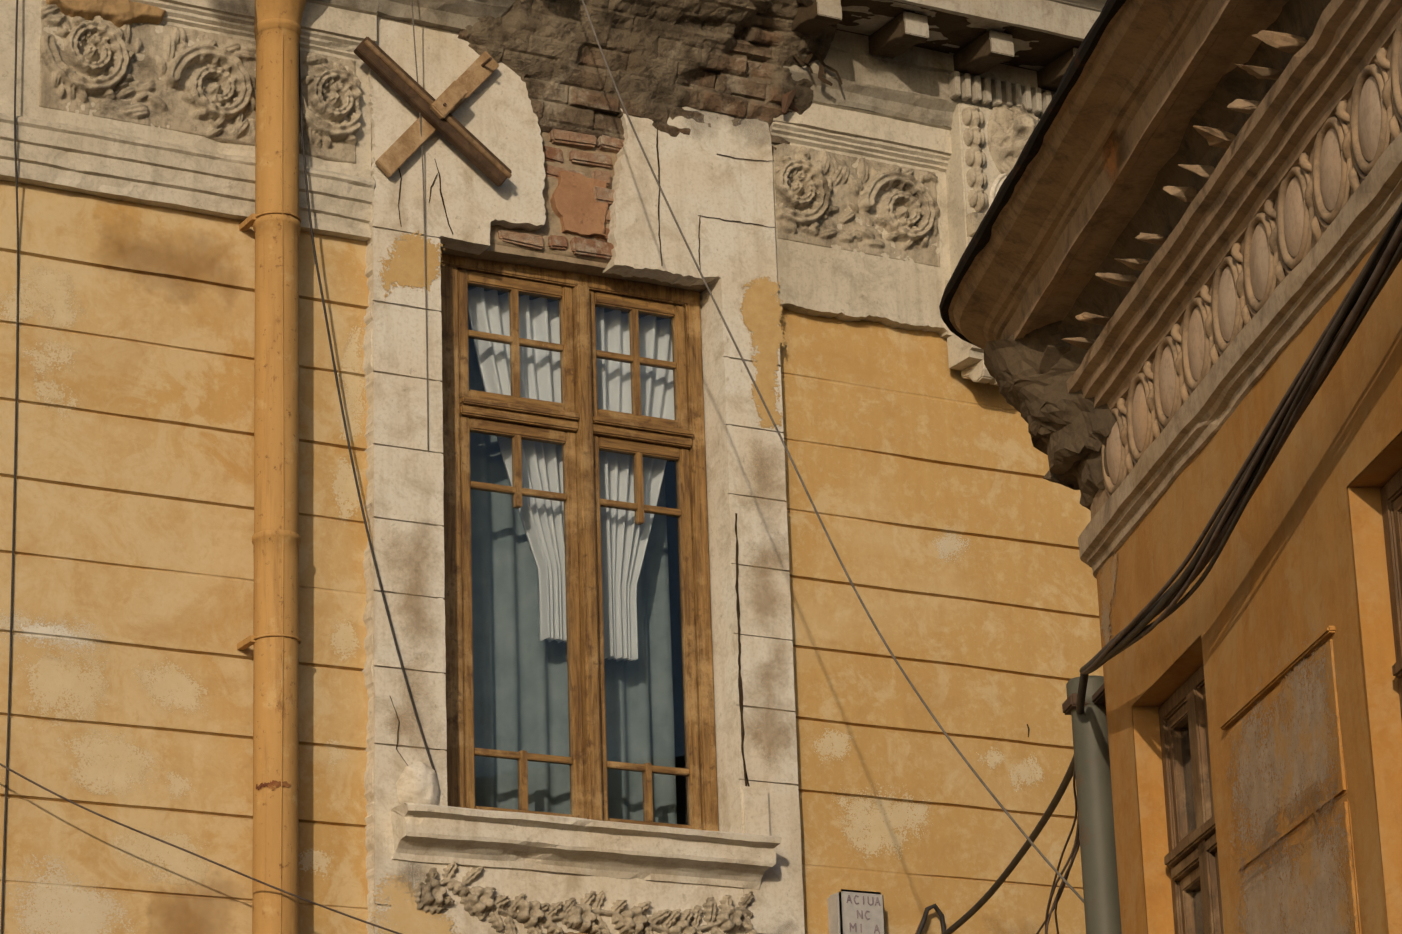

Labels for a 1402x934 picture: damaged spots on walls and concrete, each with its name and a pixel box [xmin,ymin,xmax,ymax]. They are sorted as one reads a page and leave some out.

spalling [1252,30,1308,55]
spalling [1235,64,1284,80]
spalling [458,0,837,264]
spalling [1193,126,1236,149]
spalling [1227,99,1261,114]
spalling [1163,164,1215,202]
spalling [1095,233,1167,288]
spalling [984,312,1117,511]
peeling [12,648,209,801]
peeling [977,746,1045,792]
peeling [830,783,933,863]
peeling [110,827,212,887]